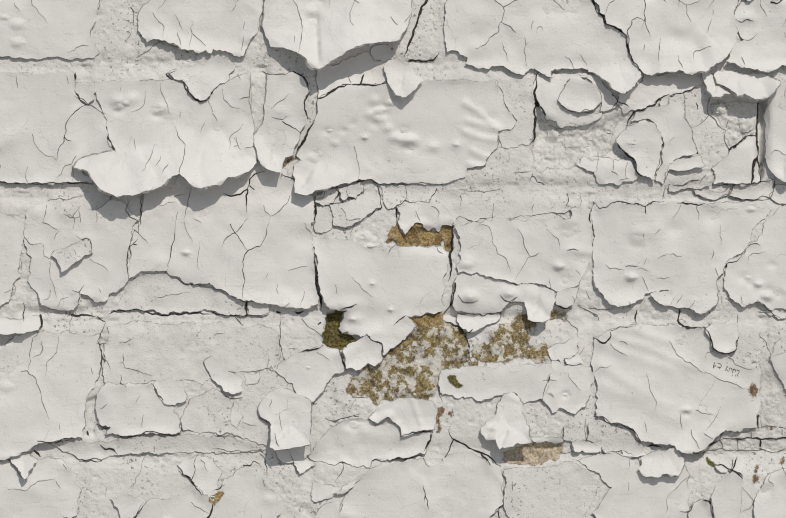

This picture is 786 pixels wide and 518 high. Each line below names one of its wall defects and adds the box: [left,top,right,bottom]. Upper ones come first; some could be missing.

crack [393,0,438,62]
crack [482,0,588,143]
crack [592,0,660,71]
peeling [137,0,786,334]
crack [549,85,786,251]
crack [0,71,385,491]
peeling [0,56,601,518]
crack [308,147,537,358]
crack [370,431,498,467]
peeling [438,320,786,518]
crack [669,294,780,388]
crack [680,407,786,511]